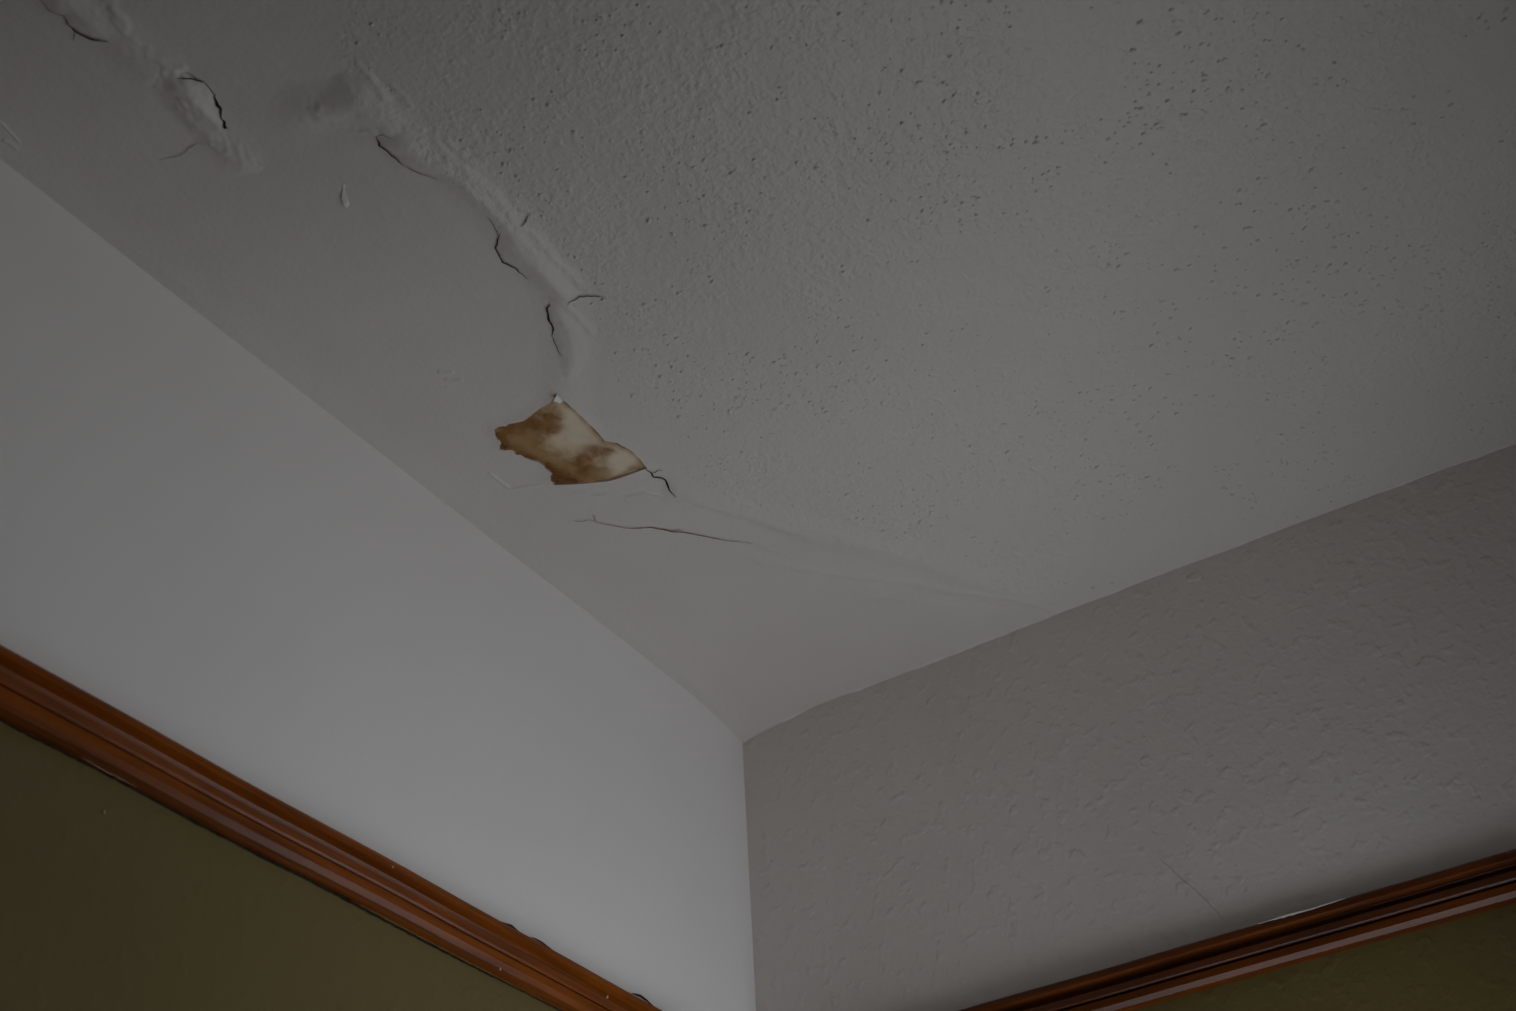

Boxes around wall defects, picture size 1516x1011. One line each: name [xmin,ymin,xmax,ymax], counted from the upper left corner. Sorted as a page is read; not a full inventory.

crack [40,0,108,42]
crack [165,72,228,159]
crack [376,135,437,180]
crack [489,214,599,357]
damp [495,411,612,485]
crack [577,467,738,542]